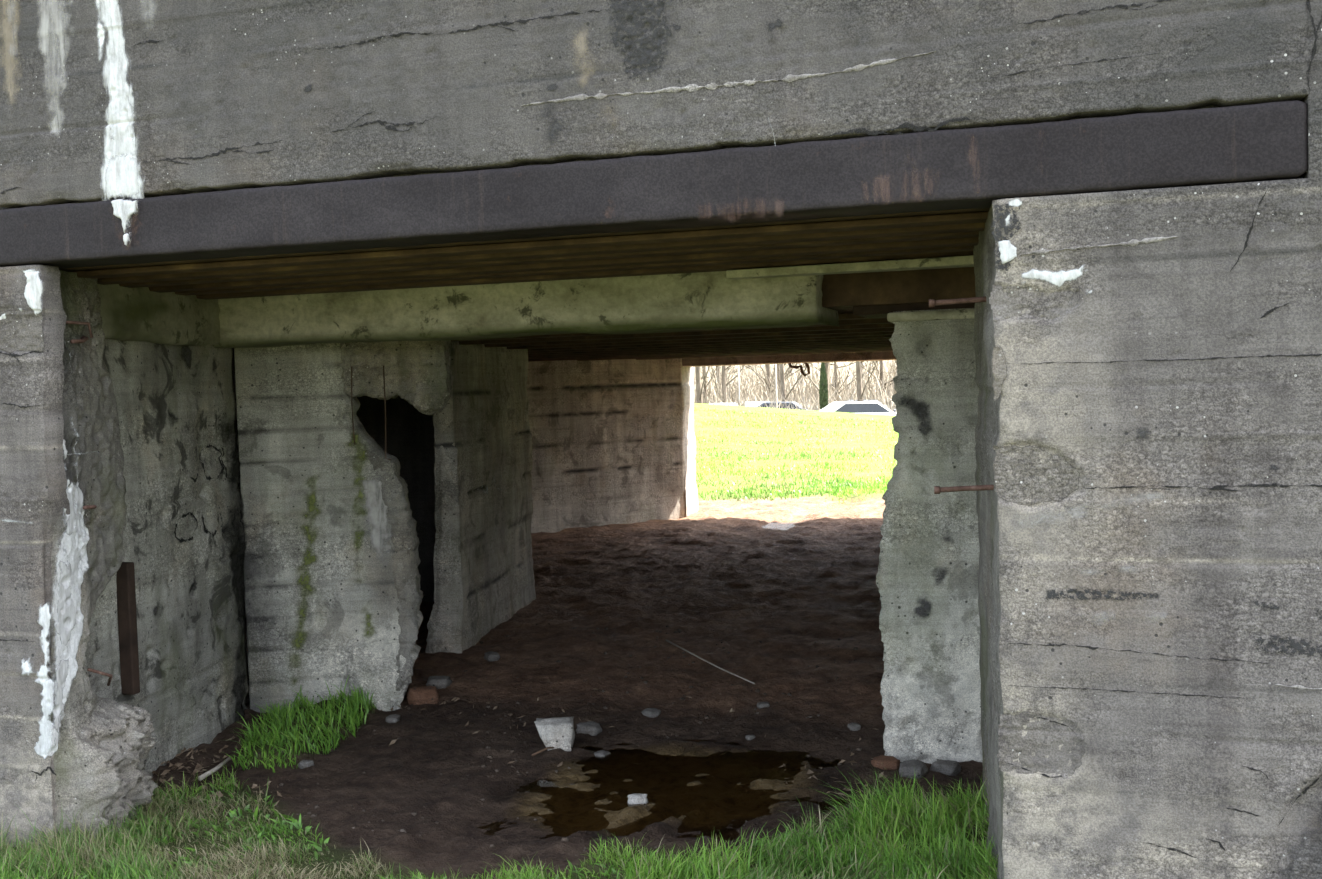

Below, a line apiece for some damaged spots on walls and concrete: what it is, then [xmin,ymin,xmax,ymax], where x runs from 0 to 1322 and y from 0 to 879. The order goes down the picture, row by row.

water stain [1,0,18,100]
water stain [40,0,66,132]
water stain [96,0,143,246]
crack [333,110,435,132]
crack [1306,0,1322,111]
spalling [929,199,1092,322]
crack [1230,188,1268,271]
spalling [363,450,418,691]
crack [1148,839,1225,858]
crack [1227,778,1319,827]